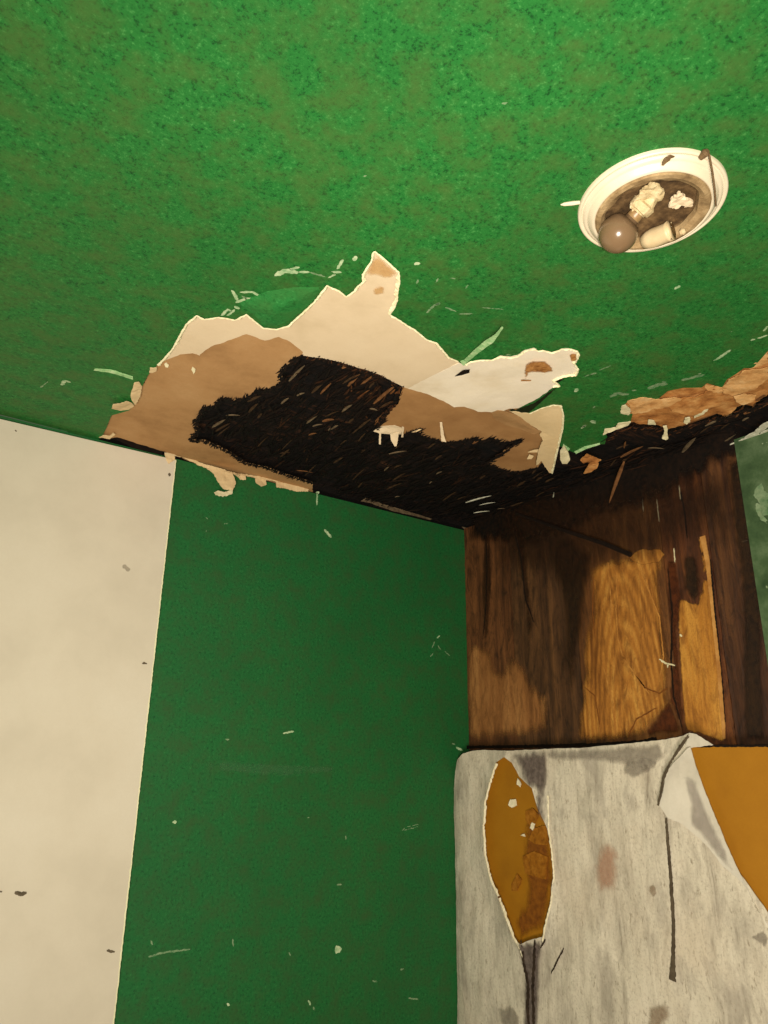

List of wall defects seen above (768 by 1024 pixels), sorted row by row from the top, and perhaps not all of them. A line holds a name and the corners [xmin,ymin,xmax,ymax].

peeling [94,369,142,411]
peeling [149,251,609,413]
peeling [164,452,319,505]
peeling [361,498,431,520]
leakage [472,426,763,738]
peeling [754,483,768,522]
leakage [519,557,698,814]
peeling [452,535,768,1024]
crack [657,568,689,982]
crack [521,940,564,1024]